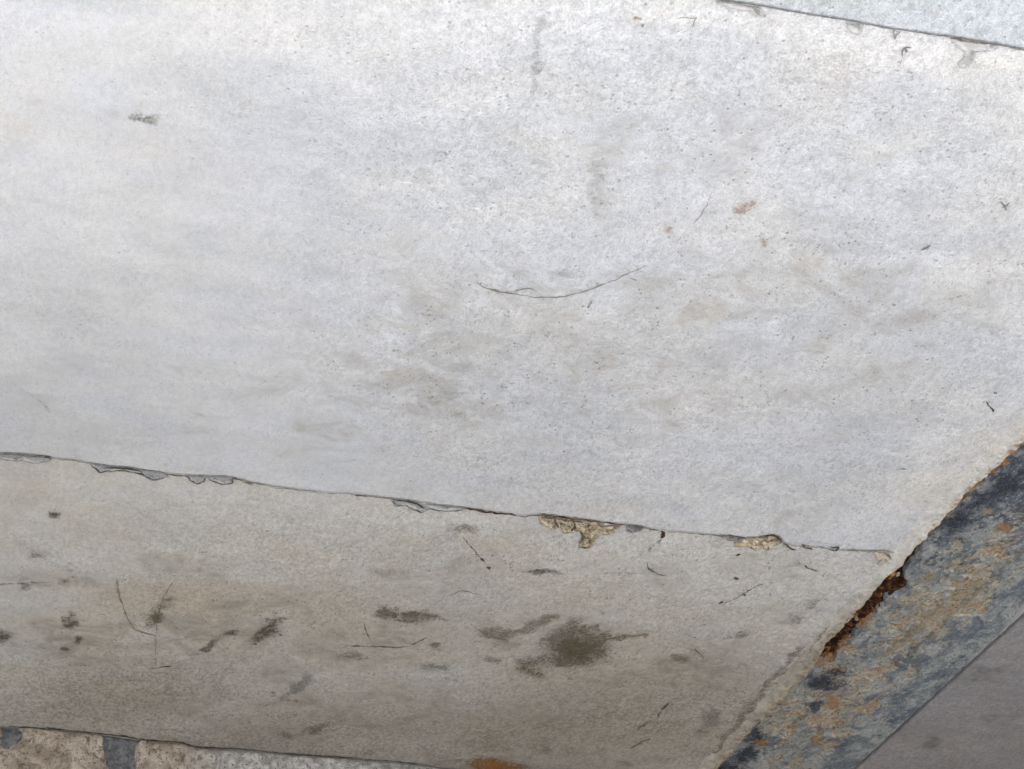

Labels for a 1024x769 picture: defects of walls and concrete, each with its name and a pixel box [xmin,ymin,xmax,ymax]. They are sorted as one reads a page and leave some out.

crack [478,266,645,309]
crack [4,453,894,576]
spalling [538,513,644,549]
rust [817,444,1024,667]
leakage [474,614,646,679]